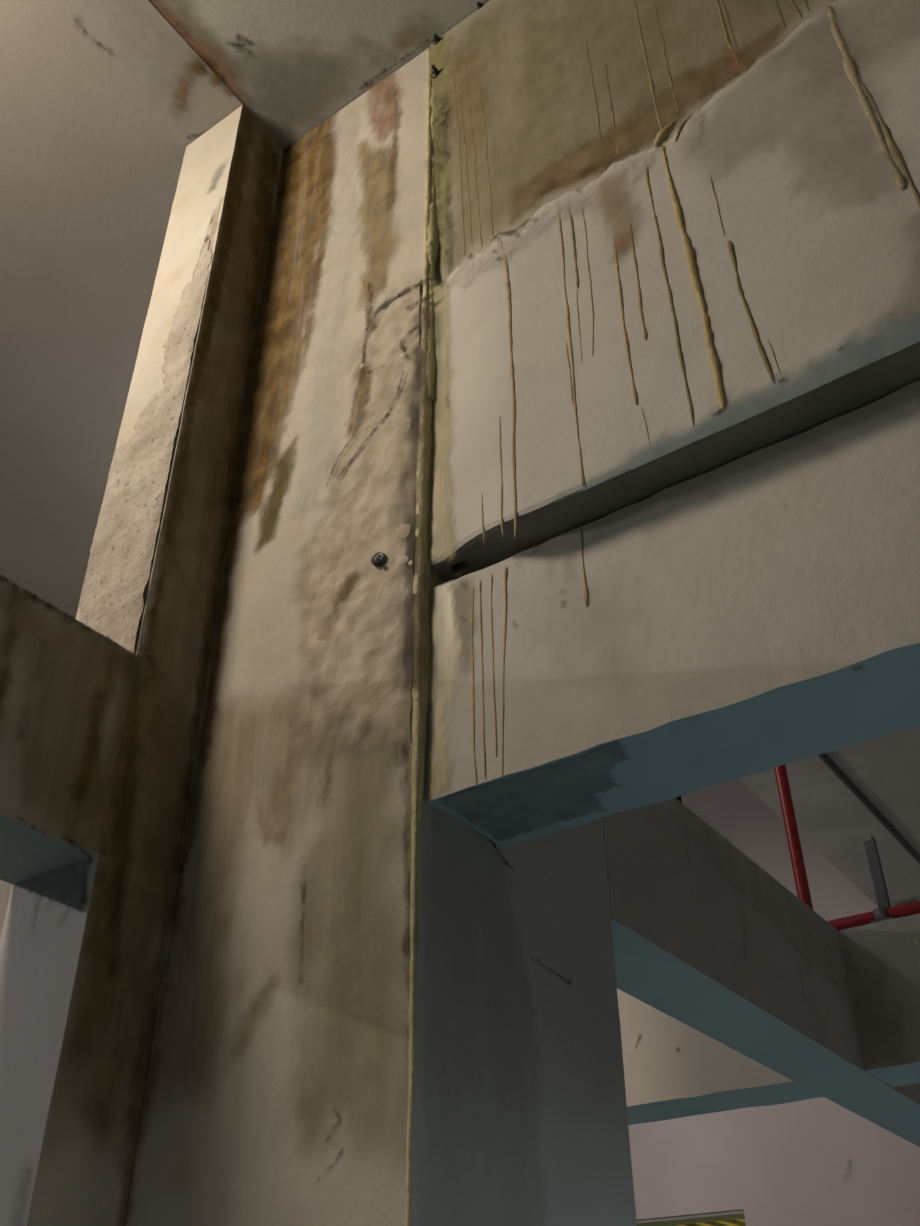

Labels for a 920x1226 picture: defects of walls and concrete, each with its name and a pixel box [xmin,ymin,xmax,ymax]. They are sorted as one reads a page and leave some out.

corrosion [359,74,397,324]
corrosion [511,39,771,220]
crack [331,275,437,479]
leakage [409,348,434,472]
leakage [90,111,270,1131]
leakage [402,491,421,685]
leakage [402,707,413,784]
leakage [403,809,411,956]